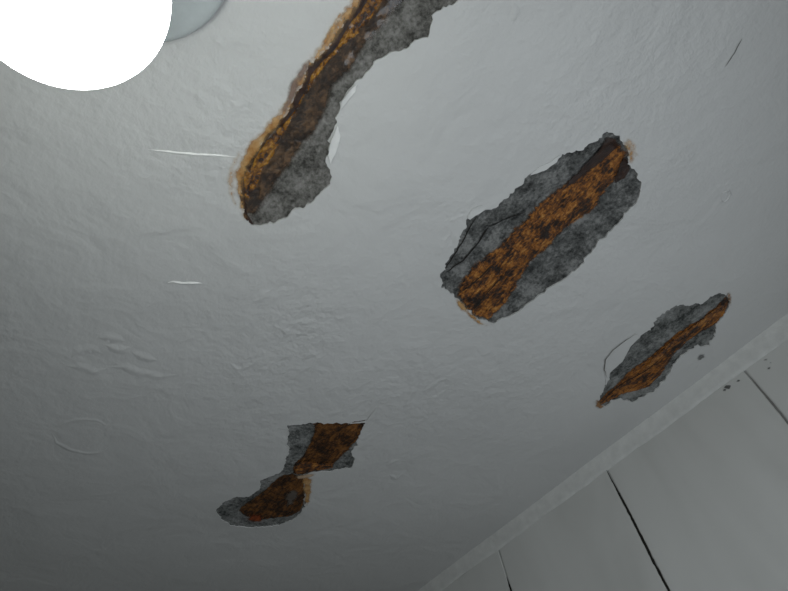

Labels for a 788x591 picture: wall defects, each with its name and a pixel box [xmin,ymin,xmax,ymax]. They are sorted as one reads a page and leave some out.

rust [229,0,359,208]
spalling [240,0,457,225]
spalling [440,132,641,323]
spalling [599,293,730,406]
spalling [216,407,378,527]
rust [298,474,313,503]